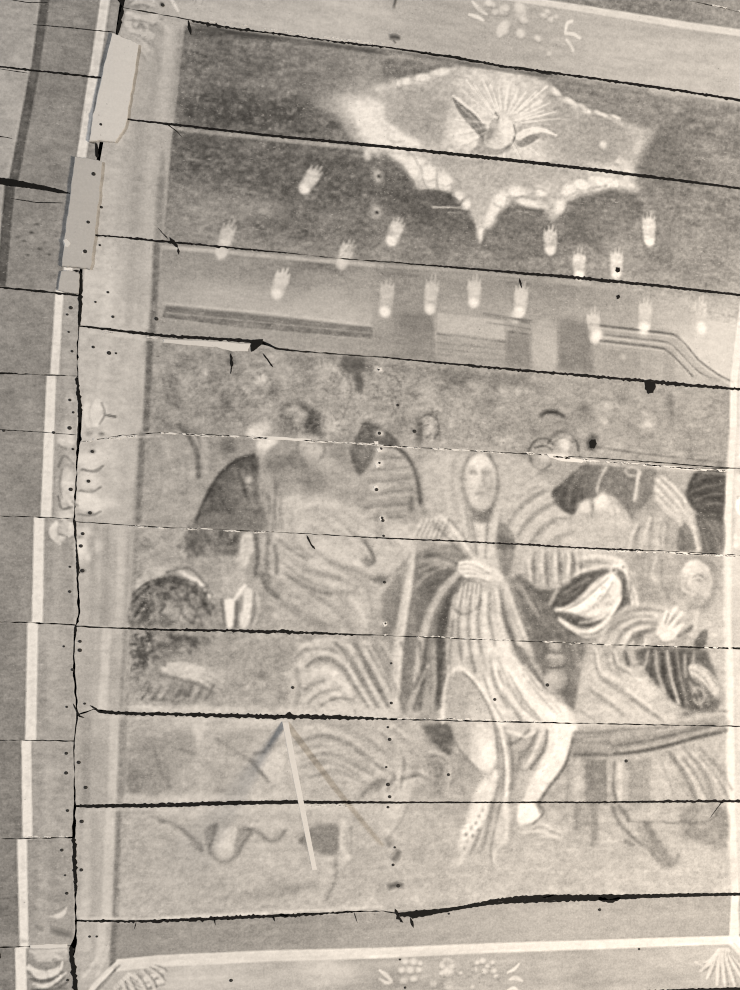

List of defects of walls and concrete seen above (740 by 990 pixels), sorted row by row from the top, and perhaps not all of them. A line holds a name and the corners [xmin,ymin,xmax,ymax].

crack [188,20,740,102]
crack [129,119,740,190]
crack [95,228,286,254]
crack [404,263,740,296]
crack [0,270,290,374]
crack [381,356,740,391]
crack [374,537,642,551]
crack [121,627,353,636]
crack [73,704,391,720]
crack [78,799,740,818]
crack [79,911,357,929]
crack [395,892,740,928]